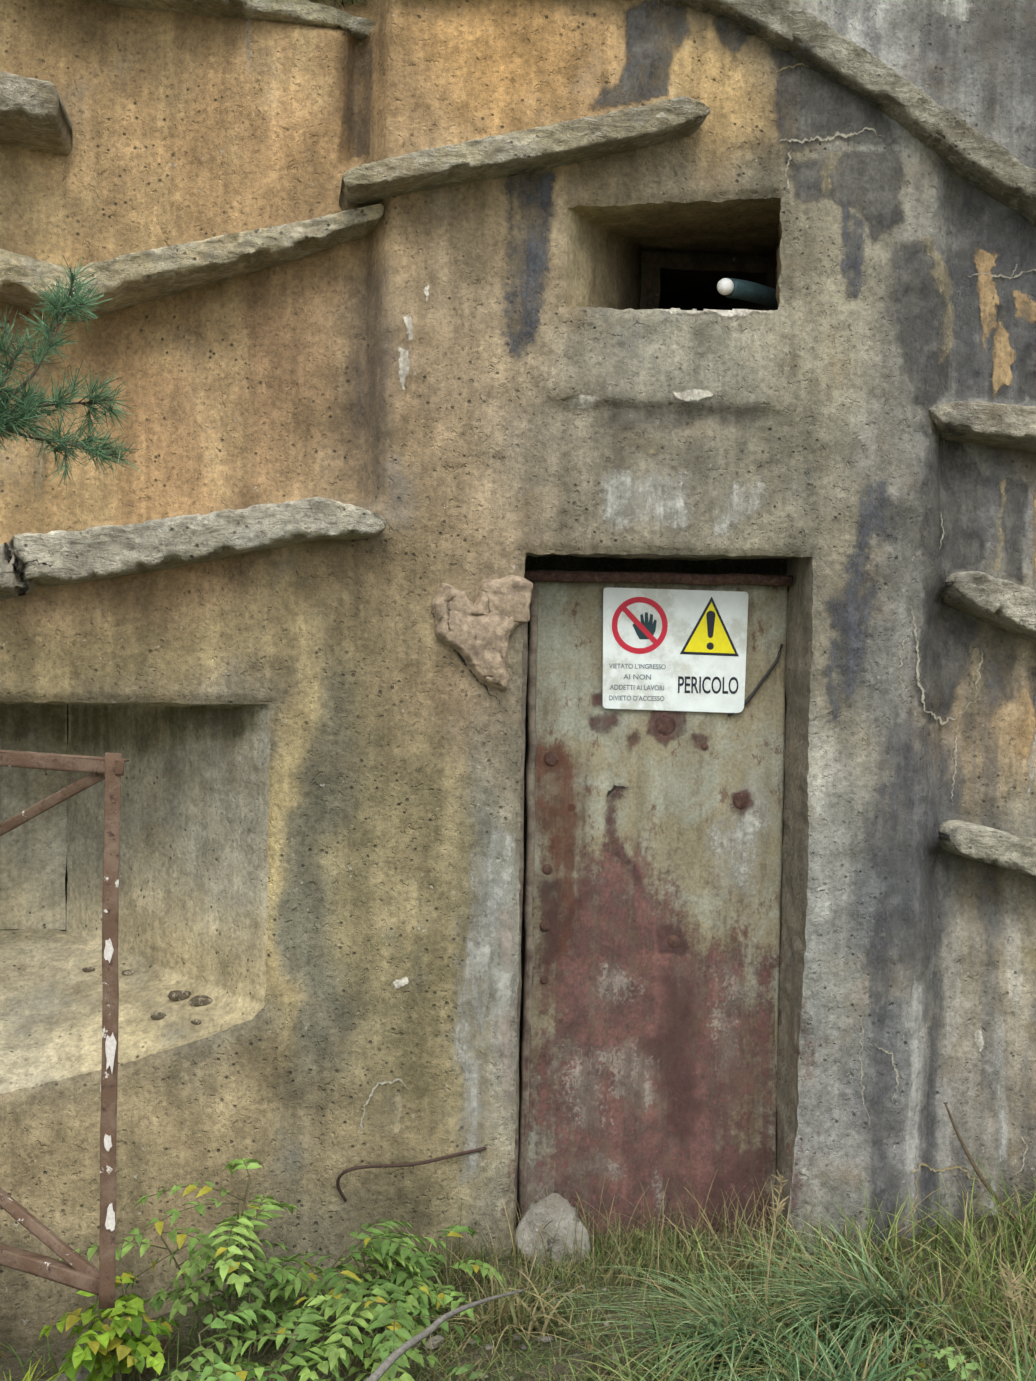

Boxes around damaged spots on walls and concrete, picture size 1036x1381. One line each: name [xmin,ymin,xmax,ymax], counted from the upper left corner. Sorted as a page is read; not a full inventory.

water stain [593,0,762,107]
water stain [502,168,557,357]
crack [777,127,885,194]
water stain [771,45,904,297]
water stain [886,174,1036,413]
crack [967,264,1036,279]
peeling [974,249,1036,393]
water stain [605,473,687,528]
water stain [825,481,897,720]
crack [897,606,983,806]
water stain [867,422,1028,1243]
rust [509,744,803,1235]